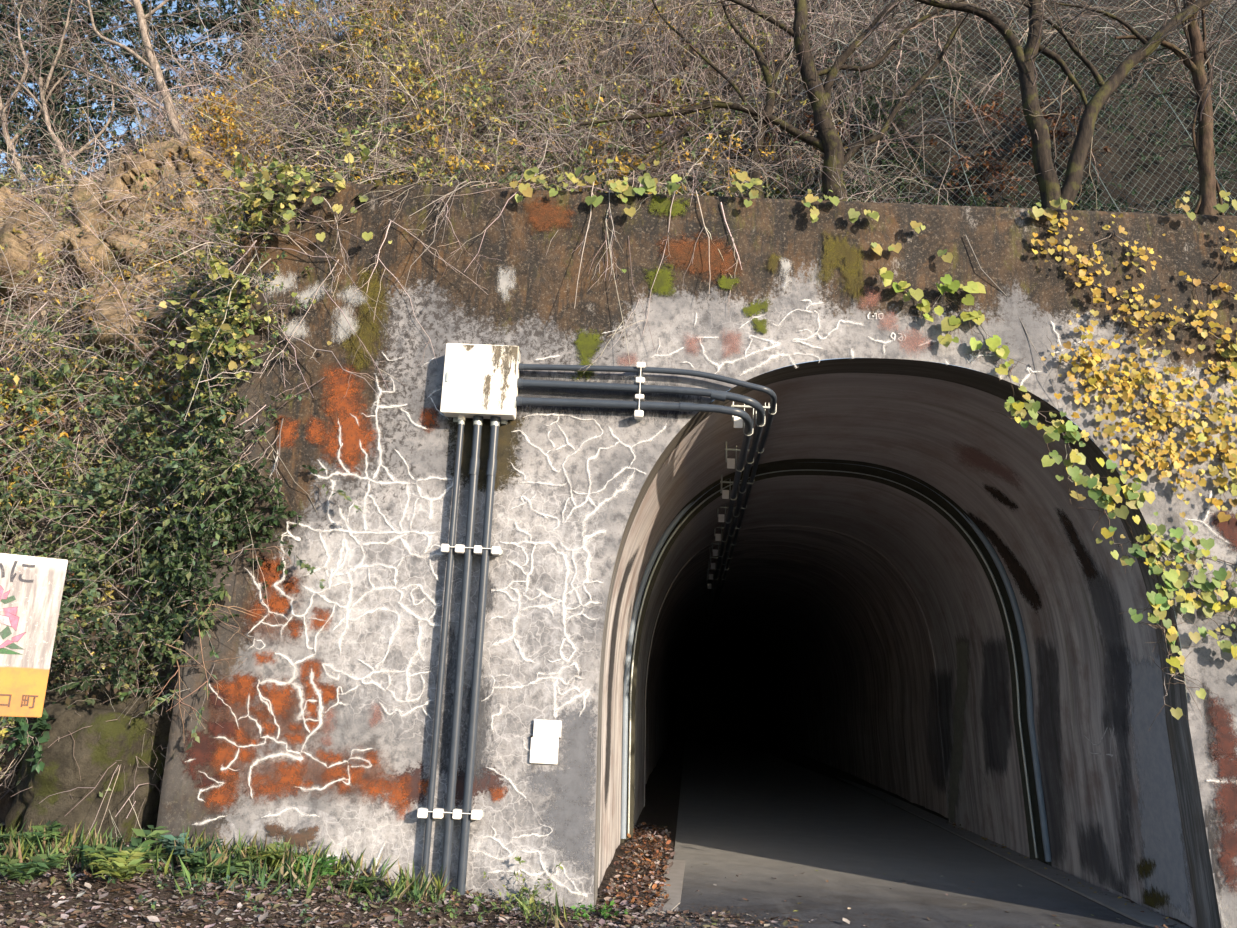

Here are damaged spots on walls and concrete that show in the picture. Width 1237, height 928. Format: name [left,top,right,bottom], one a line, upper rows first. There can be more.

rust [659,234,743,282]
crack [625,282,890,378]
crack [919,321,1085,385]
rust [276,366,378,474]
rust [246,557,332,663]
crack [188,352,453,825]
crack [485,414,667,729]
rust [182,659,429,819]
crack [487,767,526,798]
leakage [927,637,1012,823]
crack [472,825,587,897]